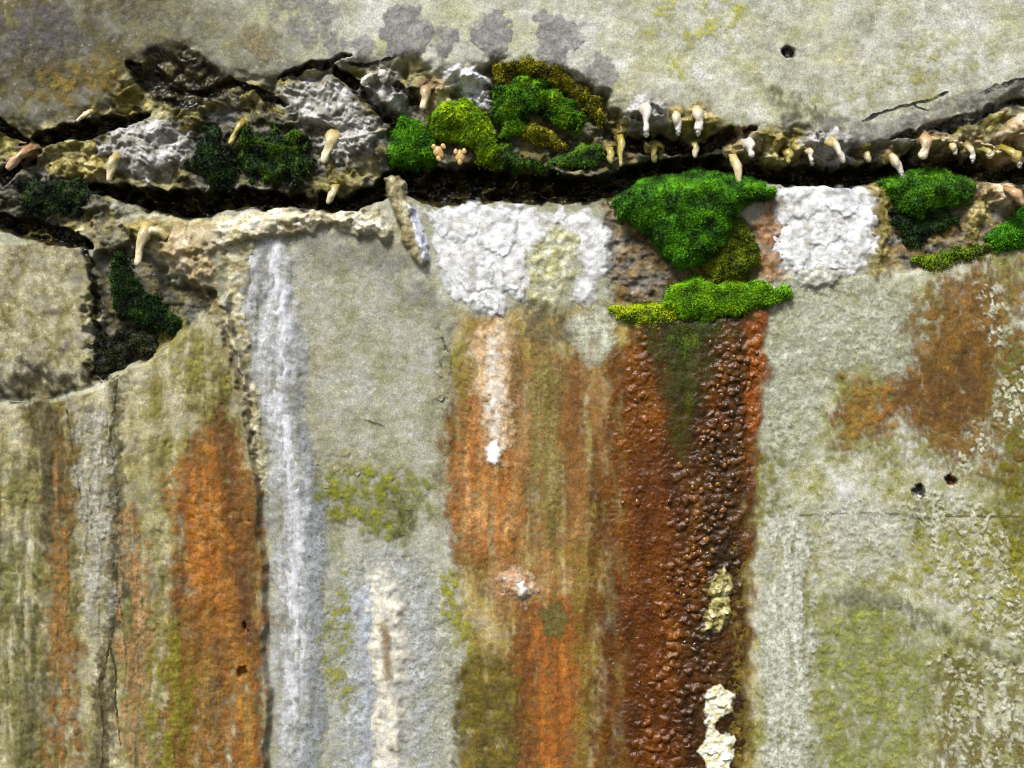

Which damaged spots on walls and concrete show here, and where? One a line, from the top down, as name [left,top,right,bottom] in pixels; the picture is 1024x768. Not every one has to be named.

crack [0,113,151,187]
crack [278,52,420,129]
crack [89,77,1024,220]
crack [0,212,103,336]
rust [827,255,1024,493]
rust [113,389,276,768]
leakage [225,238,329,768]
rust [438,308,773,768]